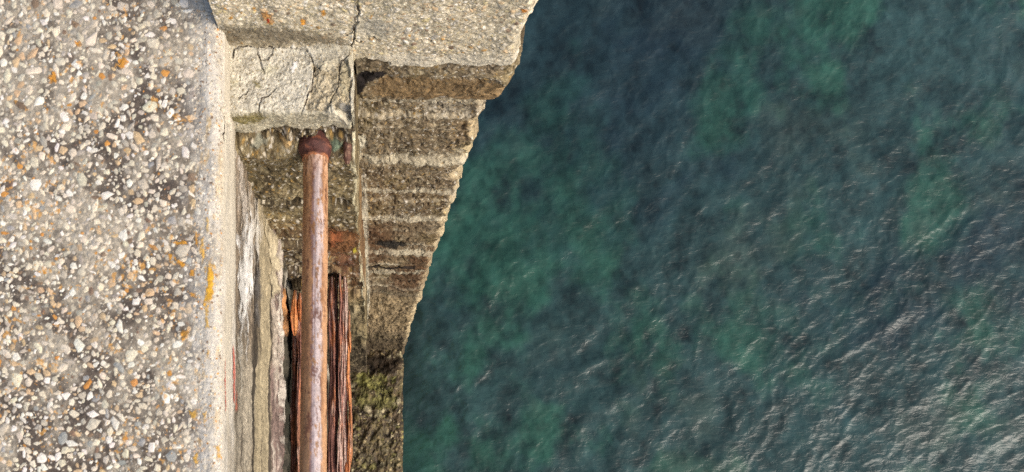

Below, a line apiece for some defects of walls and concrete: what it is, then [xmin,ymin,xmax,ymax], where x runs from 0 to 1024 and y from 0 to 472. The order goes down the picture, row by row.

crack [220,0,361,141]
corrosion [326,228,358,472]